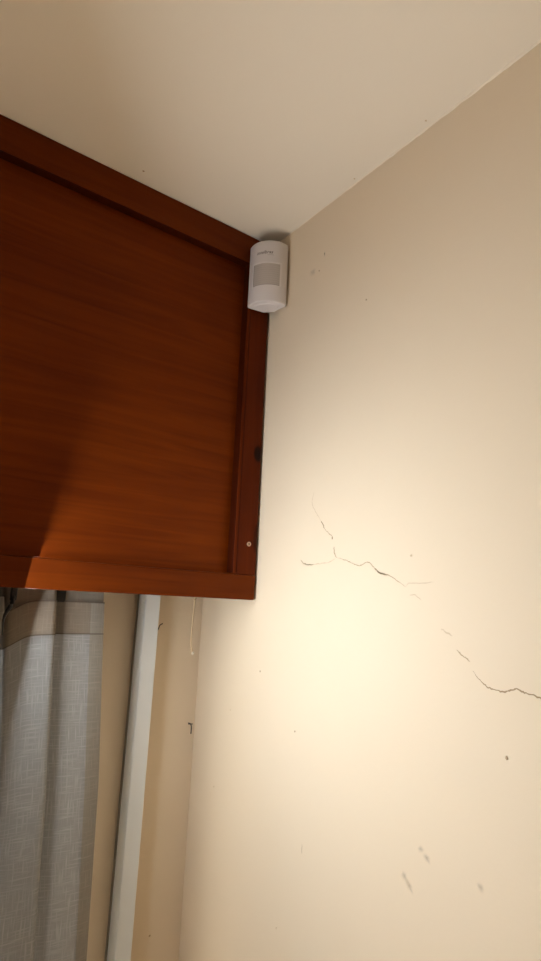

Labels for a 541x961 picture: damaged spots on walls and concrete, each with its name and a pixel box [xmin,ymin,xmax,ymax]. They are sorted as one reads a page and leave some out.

crack [301,494,430,600]
crack [441,629,541,699]